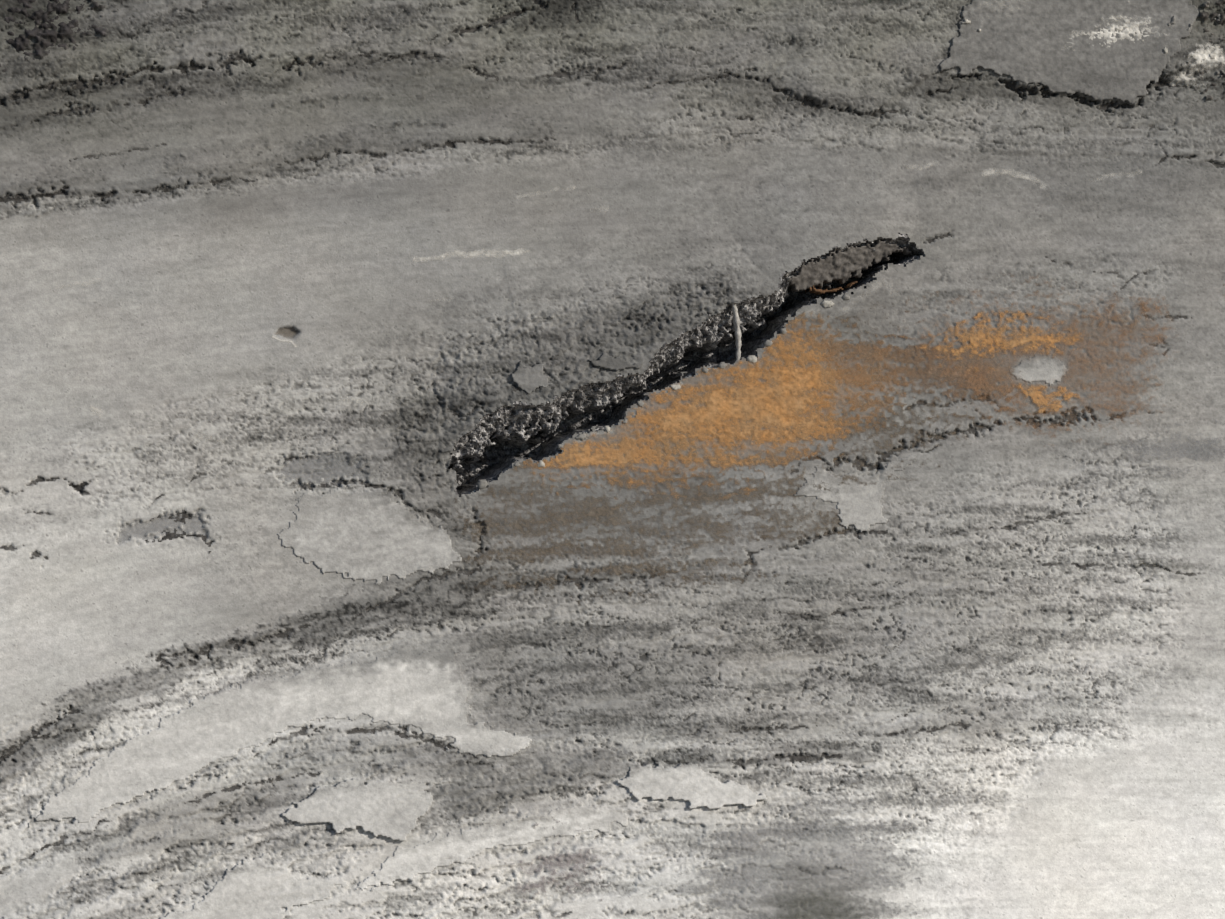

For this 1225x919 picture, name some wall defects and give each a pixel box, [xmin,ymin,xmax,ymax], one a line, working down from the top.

crack [0,51,315,126]
crack [359,0,579,81]
crack [543,63,626,79]
crack [646,68,1225,168]
crack [0,137,556,205]
peeling [511,361,552,394]
rust [524,296,1165,484]
spalling [120,510,213,553]
peeling [277,449,466,585]
peeling [28,649,532,827]
peeling [617,762,767,809]
peeling [160,778,628,919]